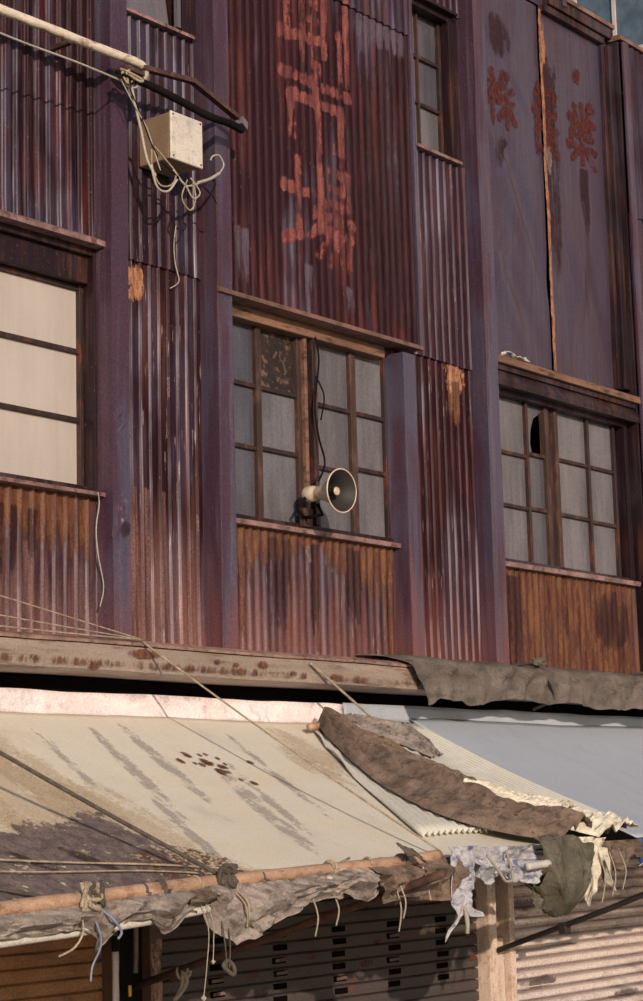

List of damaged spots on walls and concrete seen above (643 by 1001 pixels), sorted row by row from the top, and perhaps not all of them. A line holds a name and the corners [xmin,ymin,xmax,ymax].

rust [54,0,86,81]
rust [128,265,144,301]
rust [443,363,465,425]
rust [1,653,38,662]
rust [0,483,89,627]
rust [54,657,113,670]
rust [123,486,267,676]
rust [236,524,394,653]
rust [506,567,636,676]